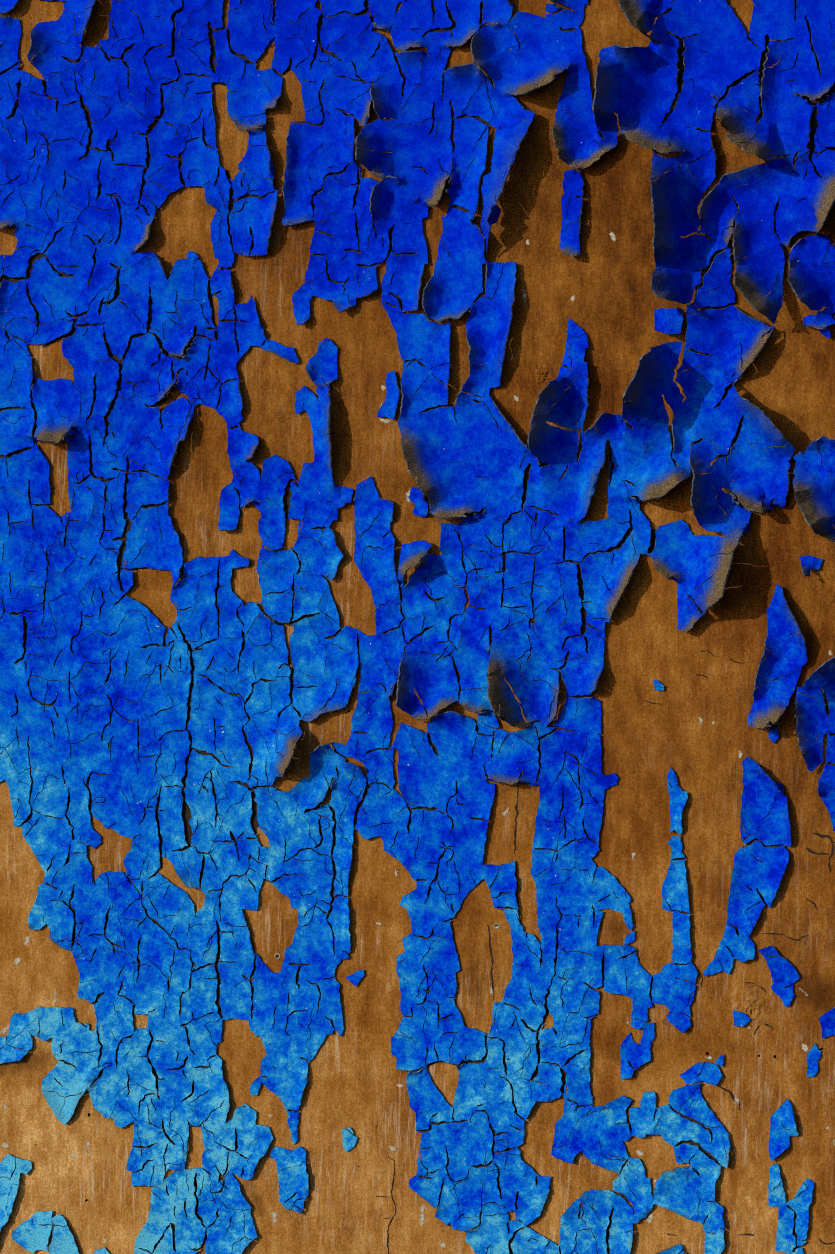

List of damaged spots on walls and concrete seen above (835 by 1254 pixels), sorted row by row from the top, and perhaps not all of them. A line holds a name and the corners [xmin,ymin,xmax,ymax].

crack [661,0,835,266]
peeling [126,28,489,642]
peeling [390,0,835,1254]
crack [696,650,835,765]
peeling [0,780,97,1037]
peeling [87,815,133,886]
peeling [217,664,475,1254]
crack [634,786,809,1020]
crack [807,833,835,873]
peeling [0,1036,205,1254]
crack [653,1063,740,1176]
crack [773,1176,835,1252]